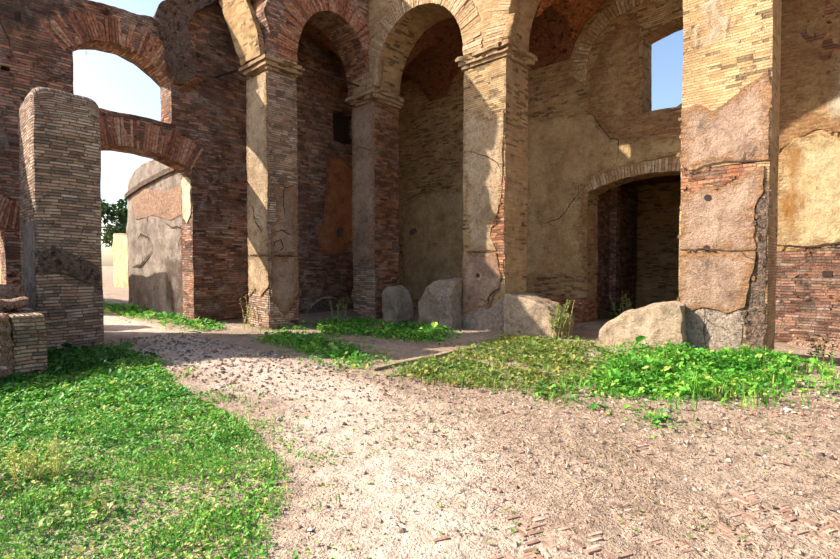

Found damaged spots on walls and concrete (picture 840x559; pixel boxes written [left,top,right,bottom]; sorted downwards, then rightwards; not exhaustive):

crack [249,184,297,257]
peeling [246,72,343,328]
peeling [336,102,377,319]
peeling [527,0,840,356]
crack [681,147,767,175]